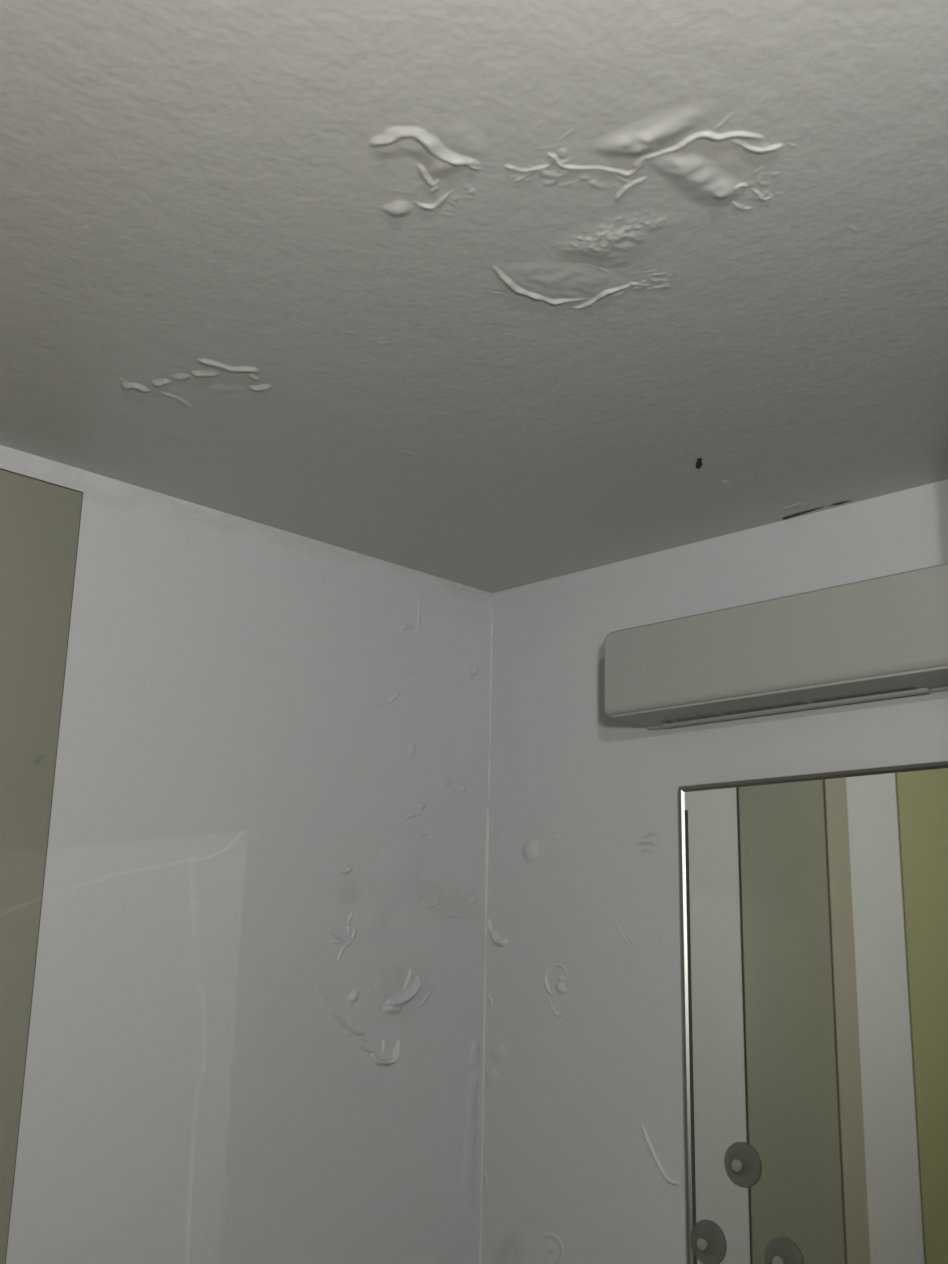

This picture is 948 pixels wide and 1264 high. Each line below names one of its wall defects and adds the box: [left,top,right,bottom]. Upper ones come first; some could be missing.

peeling [490,98,797,309]
peeling [118,358,272,408]